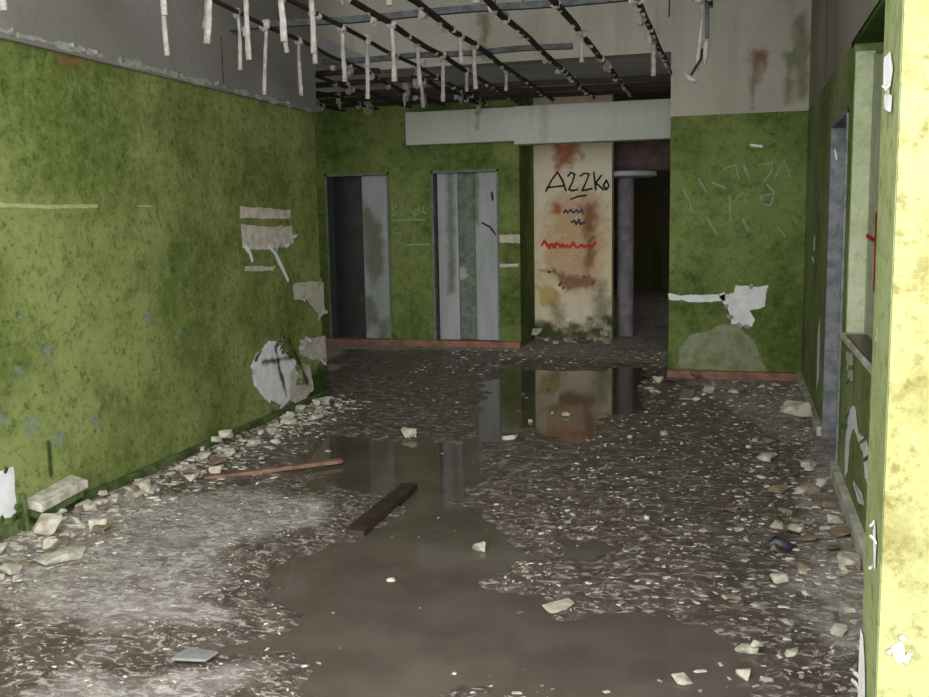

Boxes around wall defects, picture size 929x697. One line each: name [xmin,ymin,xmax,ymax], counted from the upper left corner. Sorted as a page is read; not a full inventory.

peeling [881,52,893,112]
rust [555,143,576,168]
peeling [240,206,328,321]
peeling [668,284,768,329]
peeling [250,335,328,411]
peeling [842,406,868,505]
peeling [0,466,22,526]
peeling [864,518,877,570]
peeling [851,628,865,697]